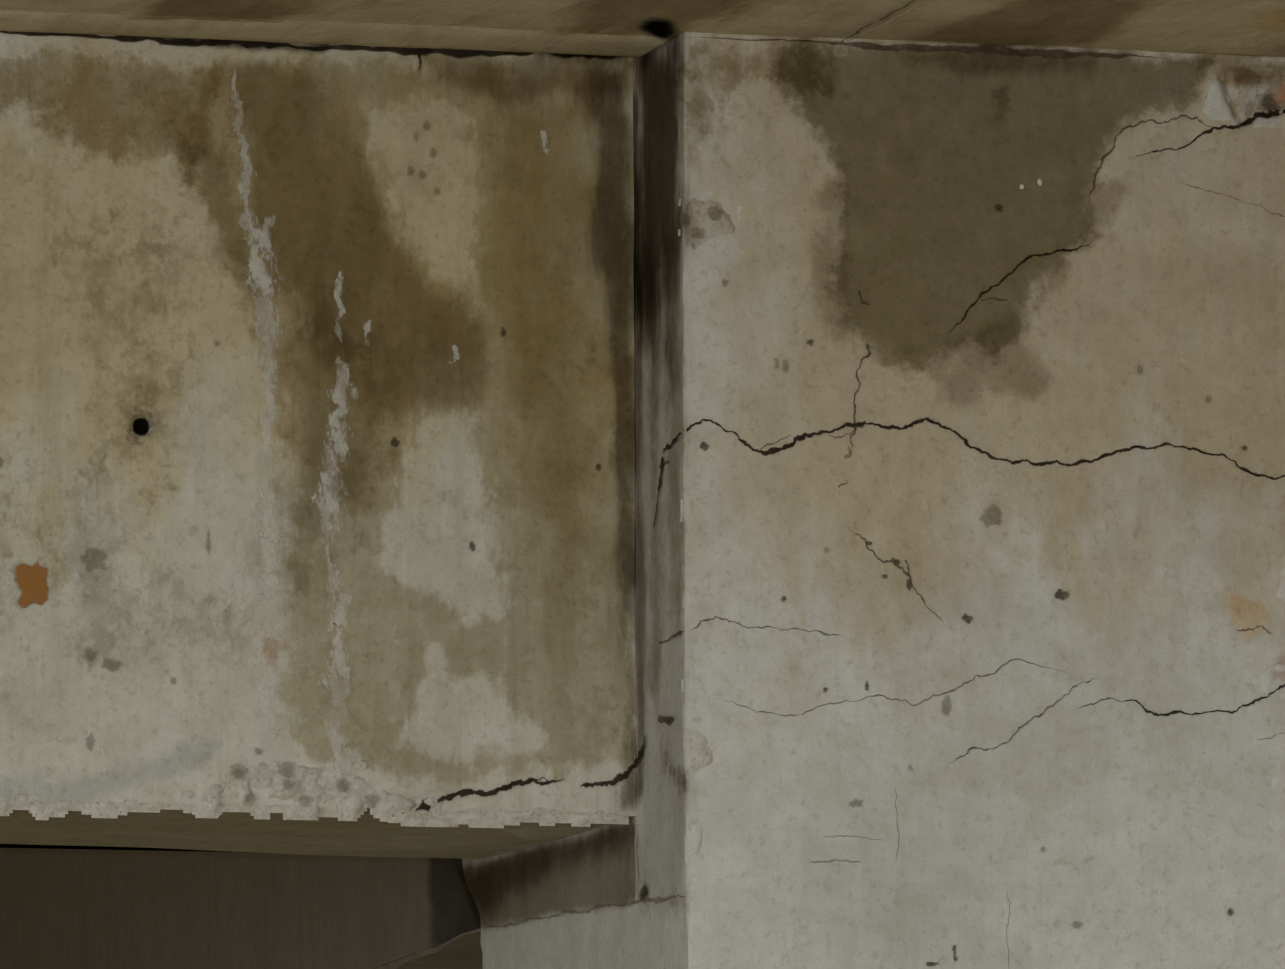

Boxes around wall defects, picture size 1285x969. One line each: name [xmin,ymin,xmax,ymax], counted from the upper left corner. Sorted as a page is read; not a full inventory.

crack [1089,109,1285,195]
leakage [240,182,273,292]
leakage [334,272,345,315]
crack [950,242,1091,332]
leakage [311,373,355,513]
crack [653,344,1285,527]
rust [15,562,48,608]
leakage [323,570,350,685]
crack [849,529,953,630]
crack [716,659,1285,762]
crack [416,736,646,811]